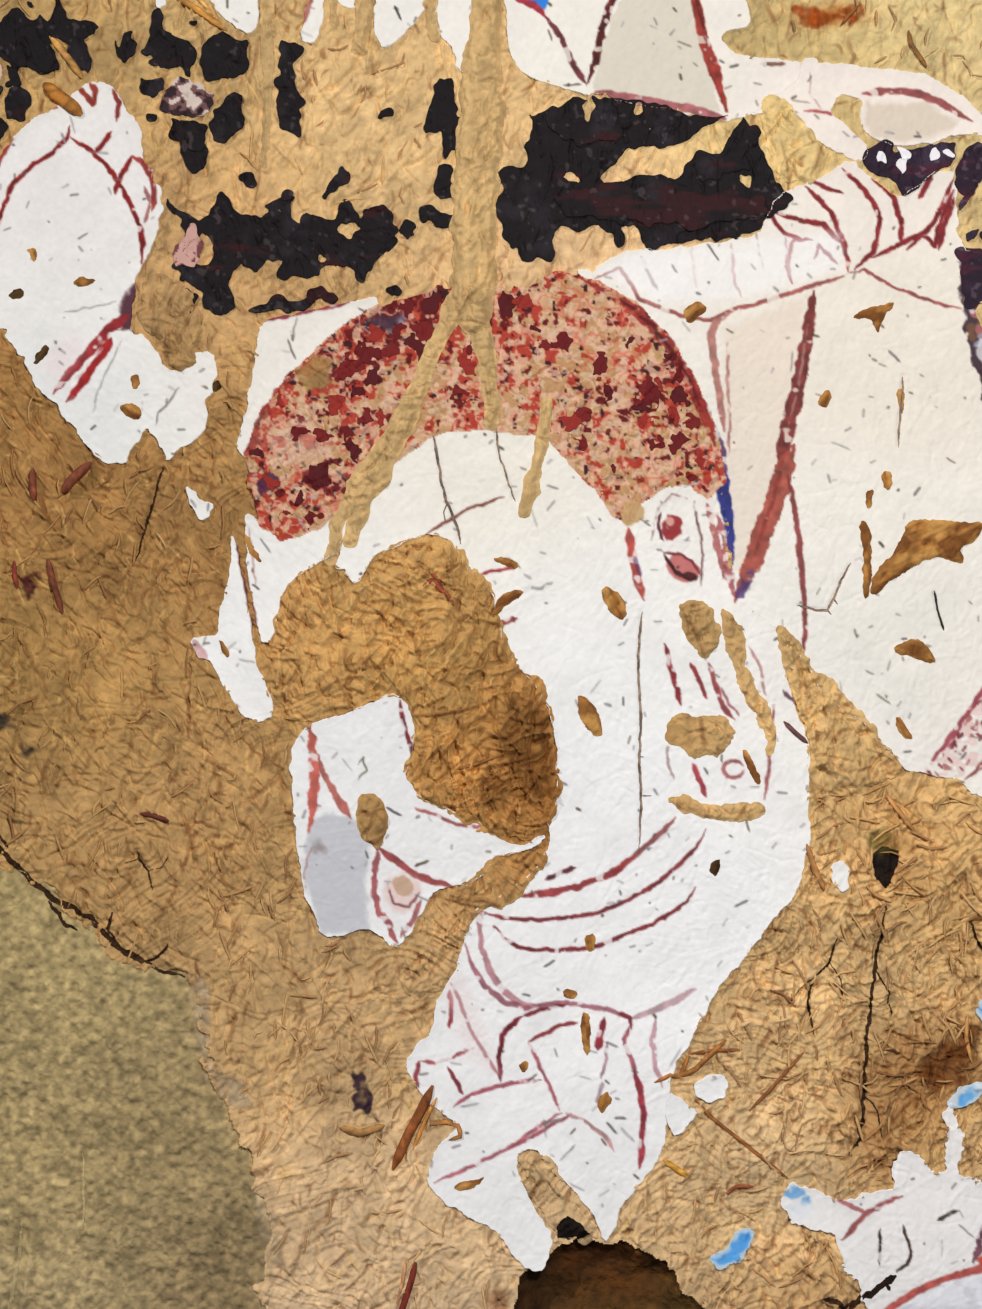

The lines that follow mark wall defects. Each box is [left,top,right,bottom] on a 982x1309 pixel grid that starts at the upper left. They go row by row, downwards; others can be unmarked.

flaking render [894,639,935,663]
spalling [665,600,776,784]
spalling [776,625,902,788]
flaking render [896,717,912,739]
spalling [268,532,563,1001]
spalling [668,794,766,822]
flaking render [709,859,720,876]
crack [0,835,185,977]
peeling [710,1228,754,1270]
crack [822,1275,897,1309]